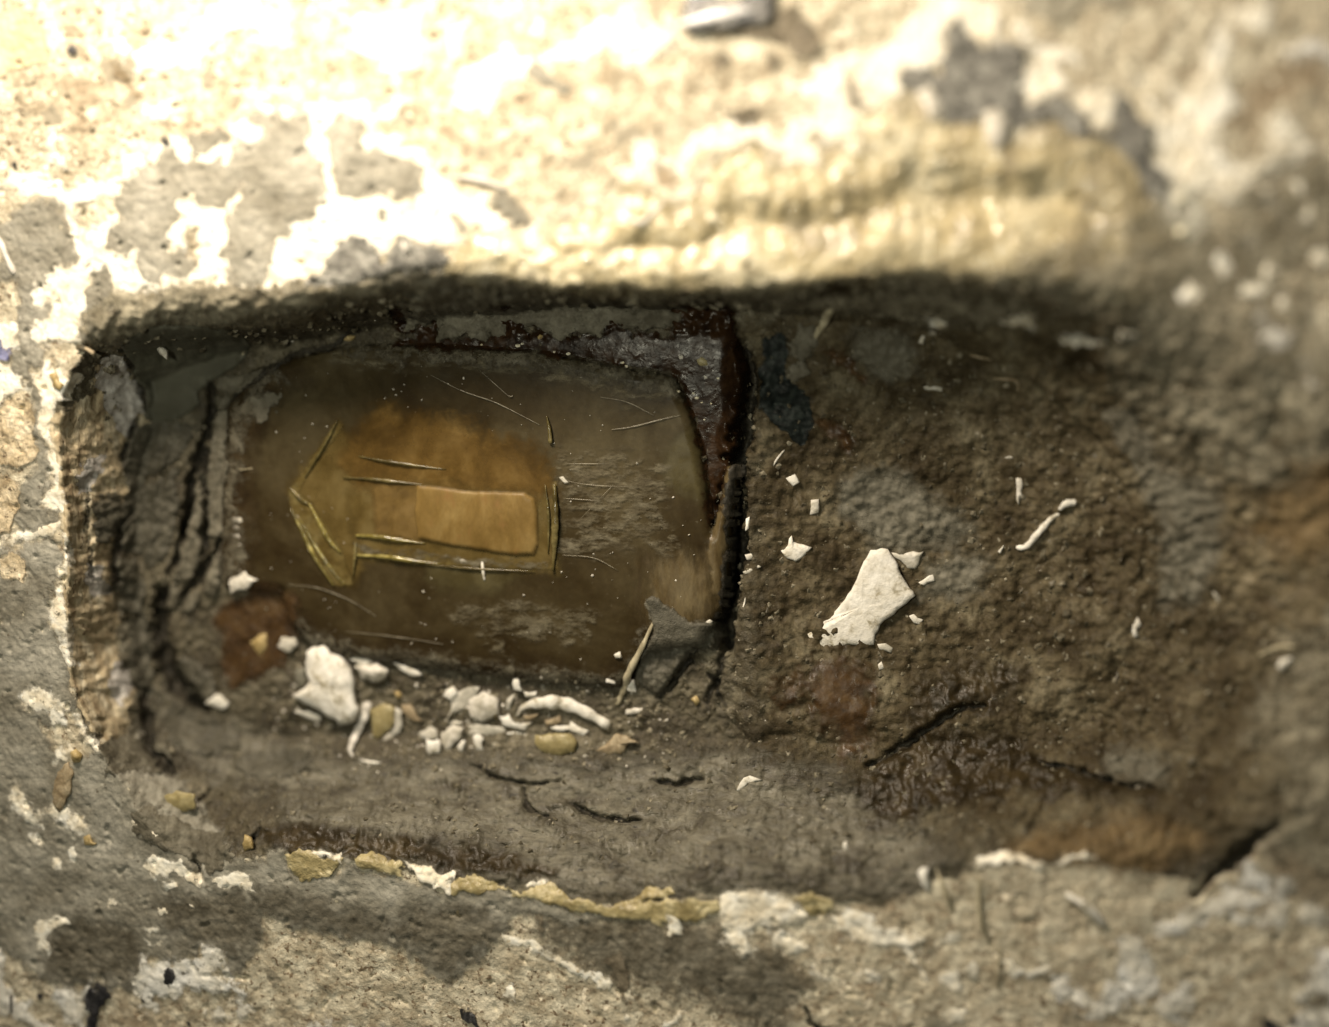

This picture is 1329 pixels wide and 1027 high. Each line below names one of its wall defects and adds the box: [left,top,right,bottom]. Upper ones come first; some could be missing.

peeling [620,0,1011,205]
damp [77,108,427,343]
crack [140,326,354,775]
damp [0,190,721,992]
spalling [0,95,1329,906]
crack [658,348,758,704]
damp [1102,152,1329,894]
crack [865,704,987,768]
damp [864,662,1156,820]
peeling [719,888,809,958]
peeling [832,908,928,983]
crack [1191,824,1280,899]